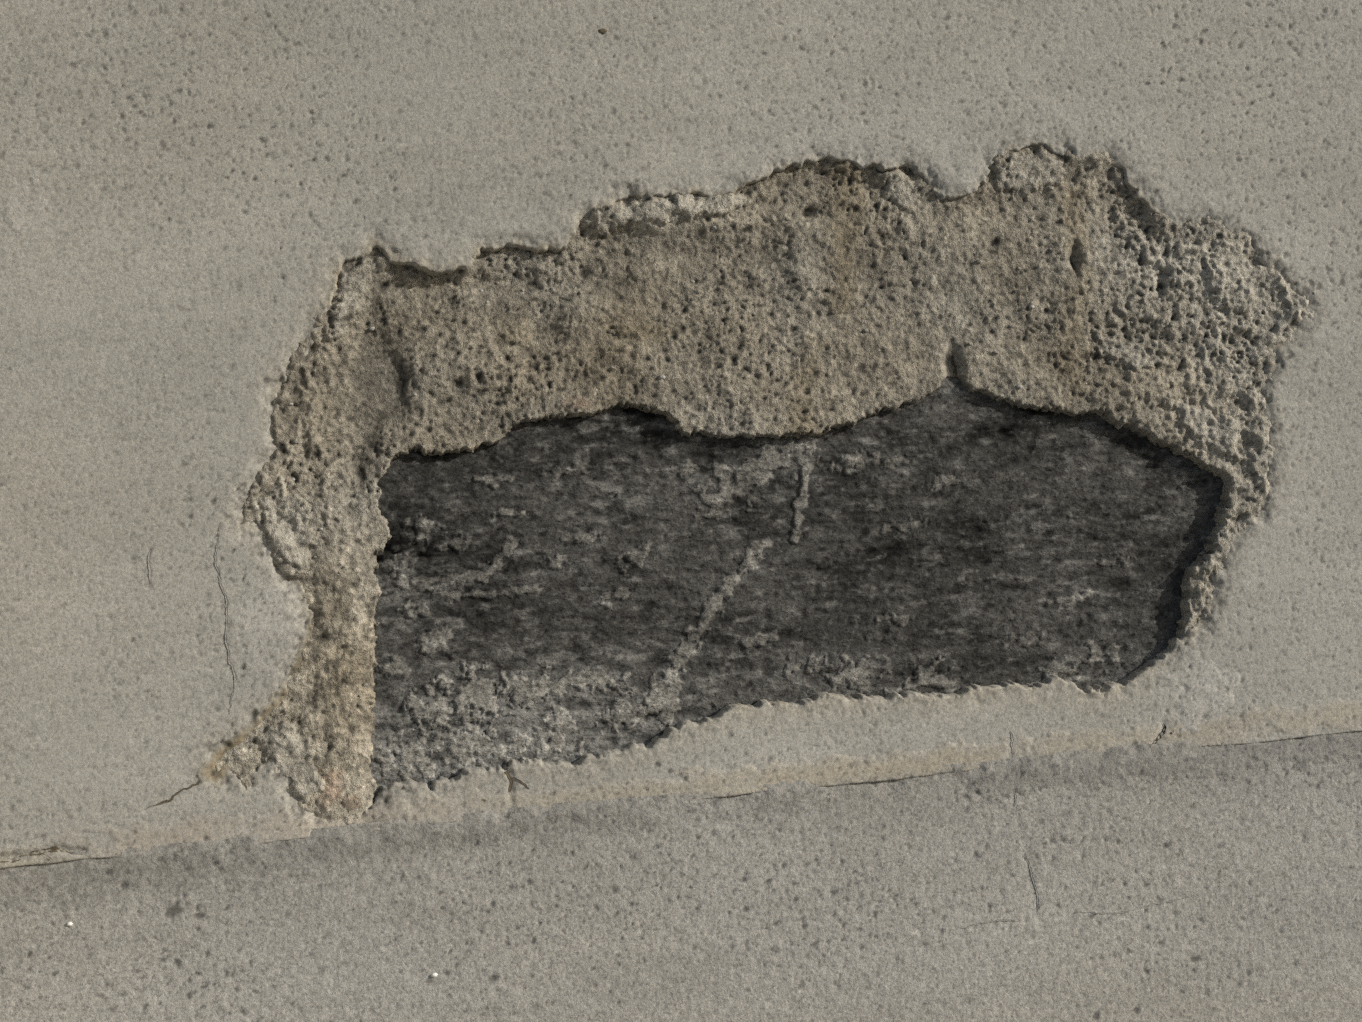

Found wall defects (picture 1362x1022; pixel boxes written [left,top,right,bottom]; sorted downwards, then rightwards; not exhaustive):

spalling [215,145,1316,825]
crack [1153,724,1172,744]
crack [481,763,530,802]
crack [0,846,70,863]
crack [966,856,1039,928]